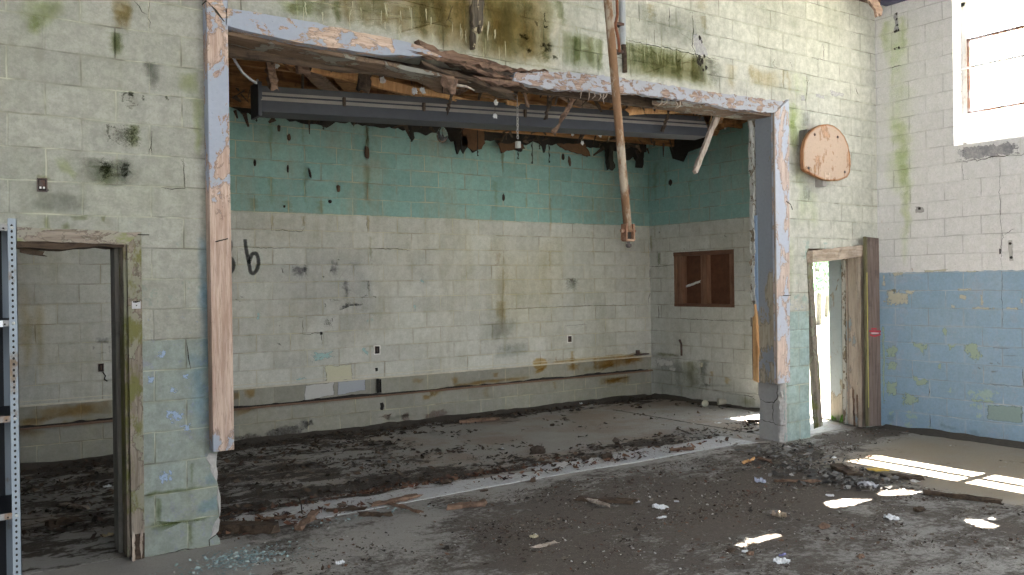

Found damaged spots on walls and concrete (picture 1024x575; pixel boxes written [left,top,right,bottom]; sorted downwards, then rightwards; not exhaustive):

leakage [450,7,506,64]
leakage [520,13,580,65]
peeling [882,272,914,306]
crack [744,385,783,426]
peeling [971,399,1023,423]